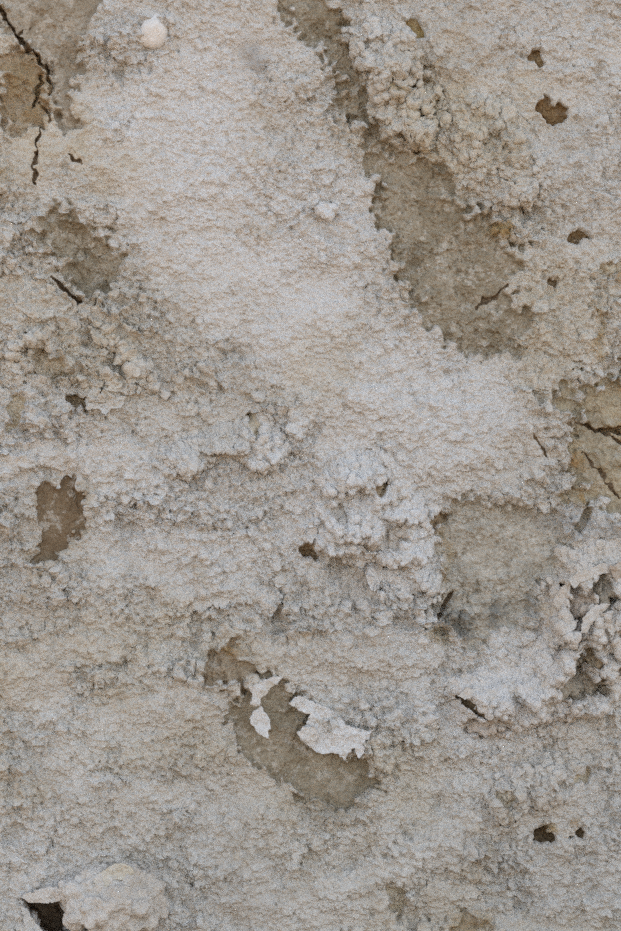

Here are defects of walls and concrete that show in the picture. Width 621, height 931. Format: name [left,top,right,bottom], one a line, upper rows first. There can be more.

crack [0,5,53,185]
spalling [30,474,86,565]
spalling [429,357,621,649]
crack [567,420,621,499]
spalling [203,636,386,811]